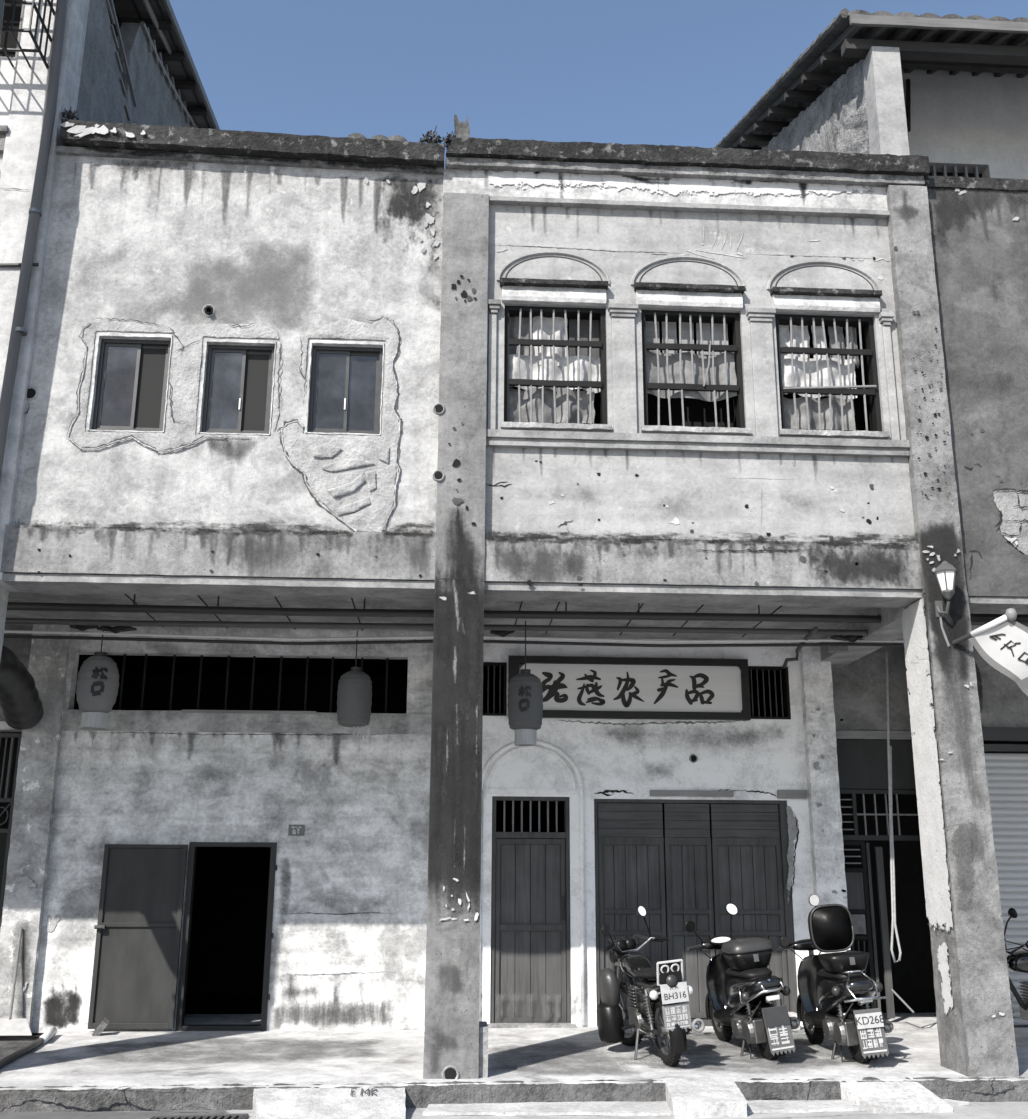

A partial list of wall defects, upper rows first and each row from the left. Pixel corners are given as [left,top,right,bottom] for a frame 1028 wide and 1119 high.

damp [83,145,193,197]
damp [222,172,230,212]
damp [327,160,437,240]
damp [935,188,1028,244]
crack [67,318,226,452]
crack [277,316,402,532]
damp [67,521,352,564]
spalling [993,480,1028,554]
damp [486,523,975,790]
damp [384,512,484,908]
damp [44,987,81,1028]
damp [281,985,387,1024]